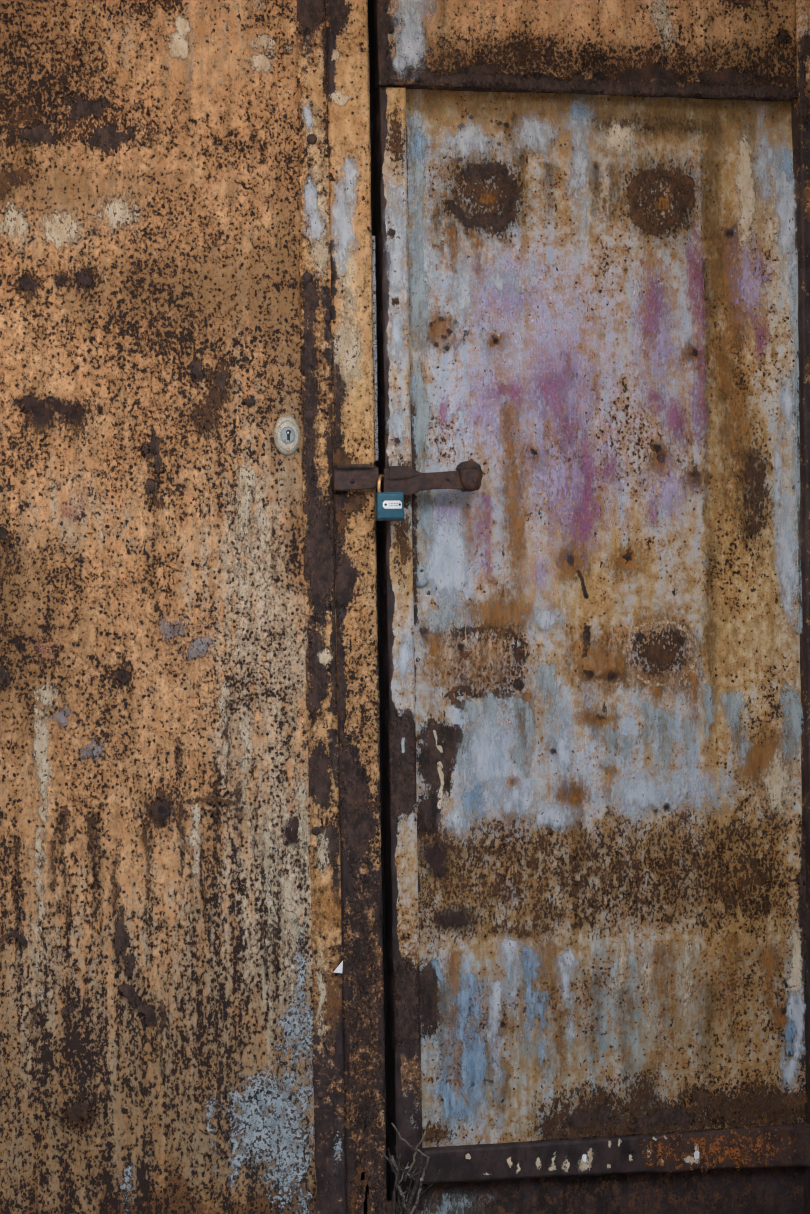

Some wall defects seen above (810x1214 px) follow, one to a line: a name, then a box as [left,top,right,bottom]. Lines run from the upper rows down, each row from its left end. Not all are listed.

rust [0,40,191,200]
rust [297,0,352,153]
rust [377,0,810,566]
rust [9,386,104,446]
rust [421,399,554,765]
rust [299,271,387,1214]
peeling [389,712,464,837]
rust [566,610,711,735]
peeling [393,953,446,1051]
rust [417,732,808,1175]
peeling [536,1148,594,1172]
peeling [684,1144,699,1165]